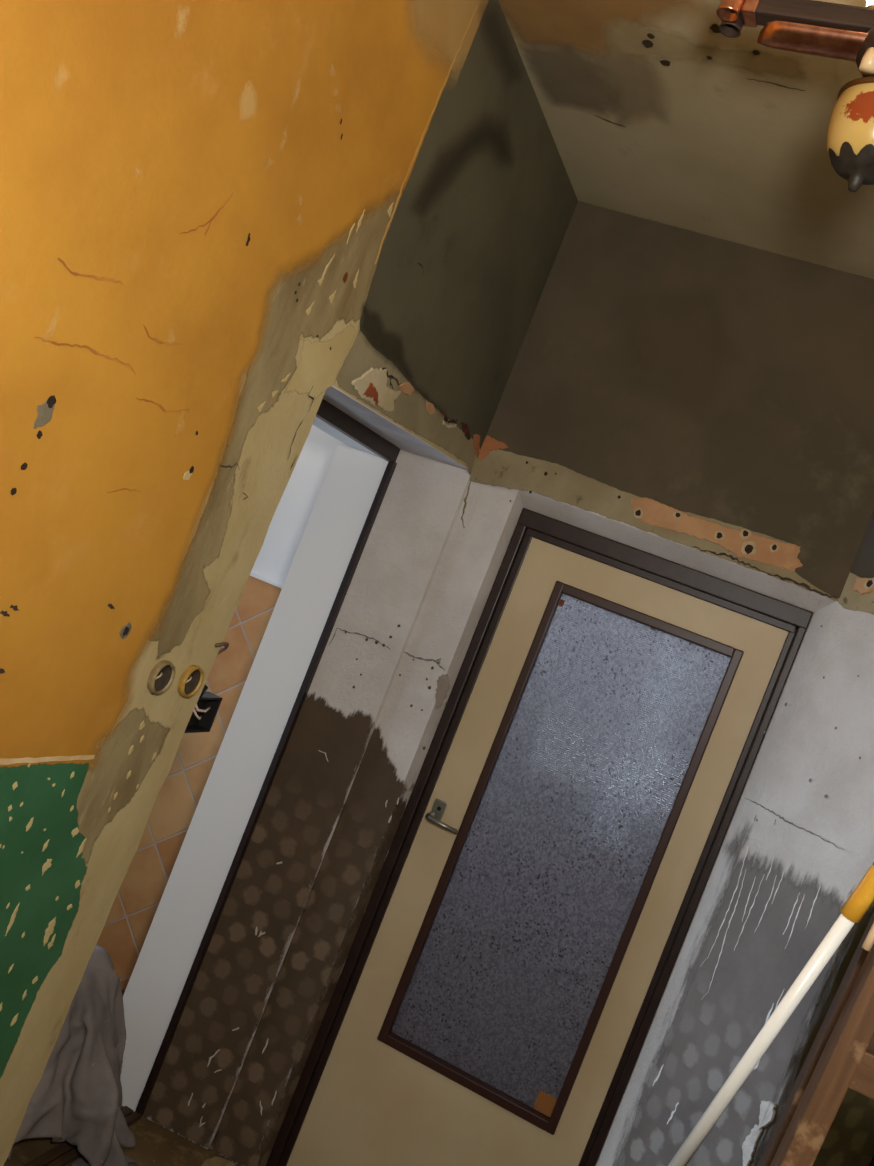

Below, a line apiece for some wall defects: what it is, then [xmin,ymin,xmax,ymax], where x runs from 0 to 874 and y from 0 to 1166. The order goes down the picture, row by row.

damp [498,0,690,111]
crack [180,193,233,235]
crack [58,258,123,285]
crack [34,337,188,412]
spalling [351,367,414,412]
peeling [149,189,404,658]
spalling [618,495,803,572]
spalling [853,577,874,596]
crack [329,628,445,671]
spalling [26,817,52,875]
spalling [6,884,30,938]
spalling [43,896,72,949]